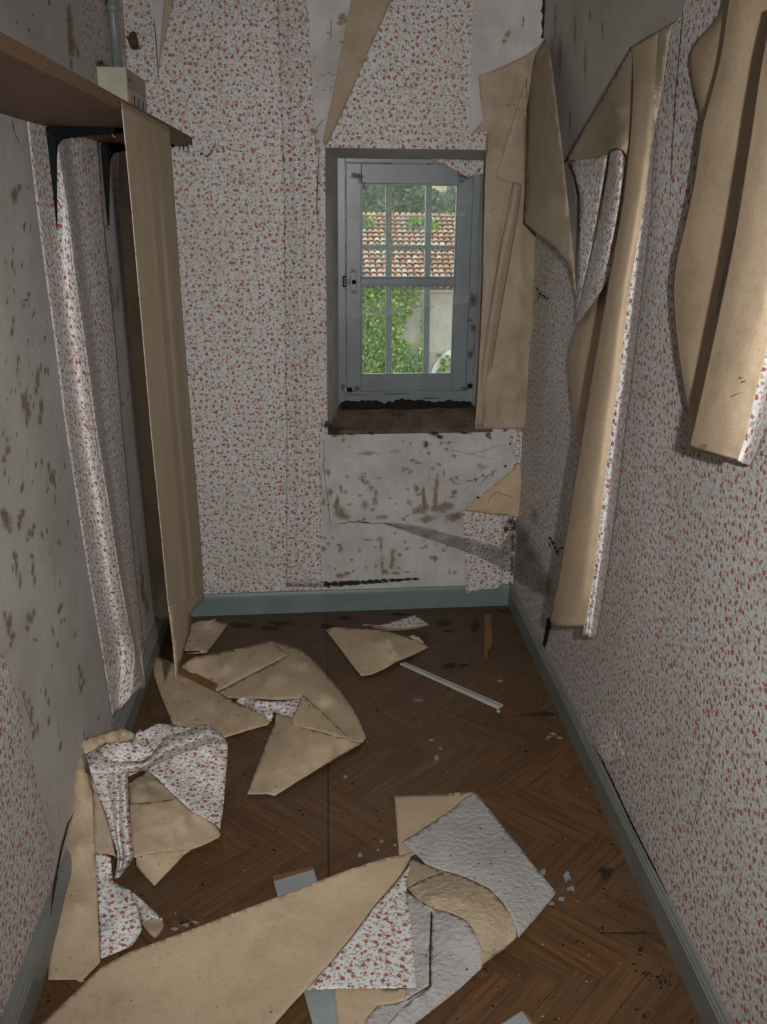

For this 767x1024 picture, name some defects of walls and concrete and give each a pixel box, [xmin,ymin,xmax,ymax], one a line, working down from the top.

peeling [308,0,392,160]
peeling [469,0,684,287]
peeling [99,142,154,631]
damp [1,510,48,540]
peeling [0,113,111,877]
damp [322,486,348,520]
damp [323,578,419,587]
peeling [320,431,521,590]
damp [413,486,461,523]